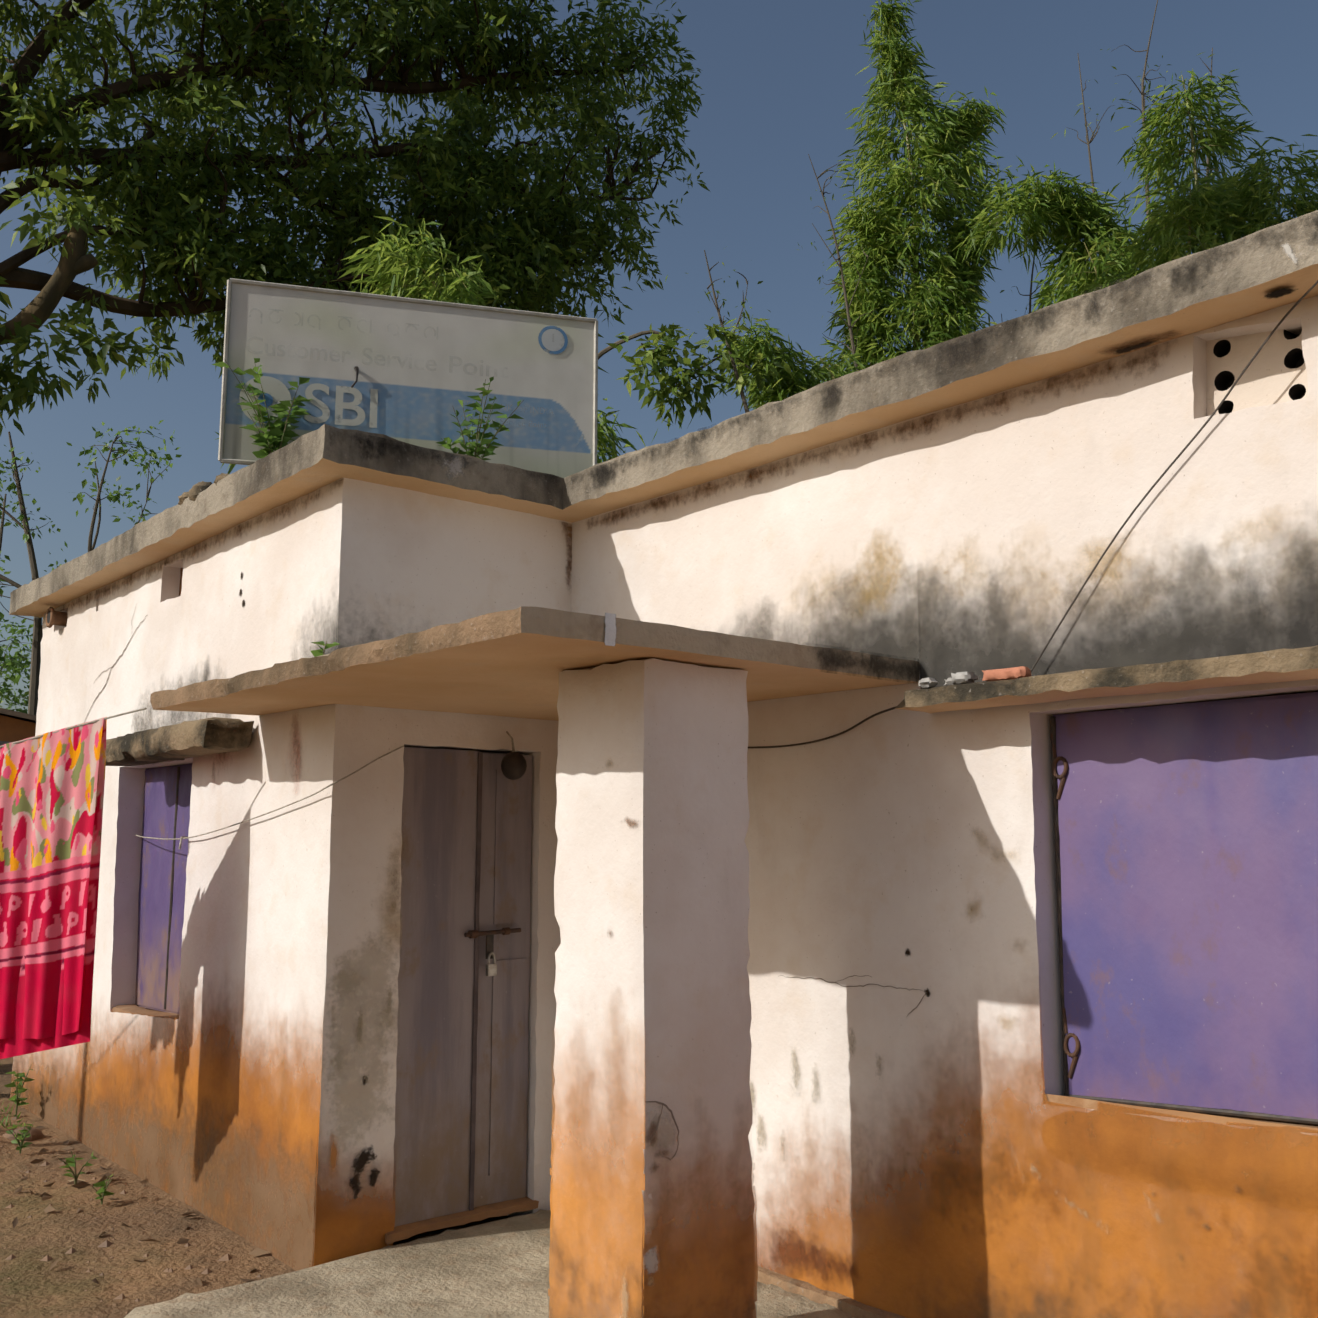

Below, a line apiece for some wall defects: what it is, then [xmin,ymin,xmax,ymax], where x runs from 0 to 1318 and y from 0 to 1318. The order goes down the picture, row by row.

water stain [590,449,654,485]
water stain [747,450,830,482]
water stain [591,496,679,524]
water stain [799,547,1318,689]
crack [781,975,925,1016]